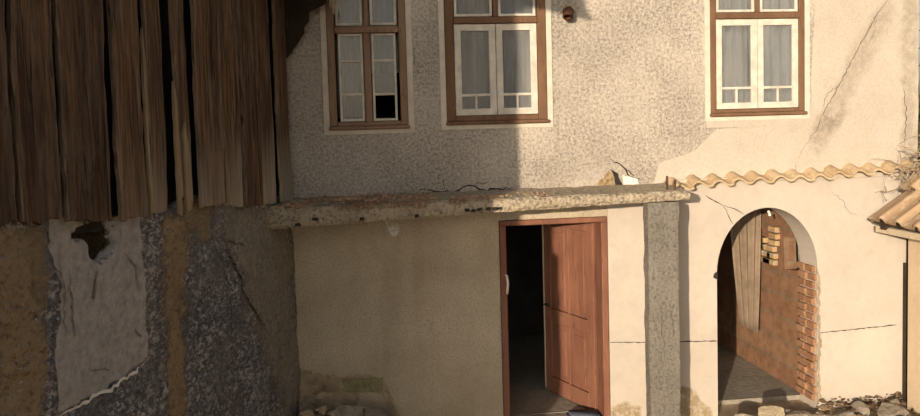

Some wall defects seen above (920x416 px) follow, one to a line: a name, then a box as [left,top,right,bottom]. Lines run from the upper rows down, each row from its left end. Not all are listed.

crack [795,0,888,170]
peeling [48,216,149,416]